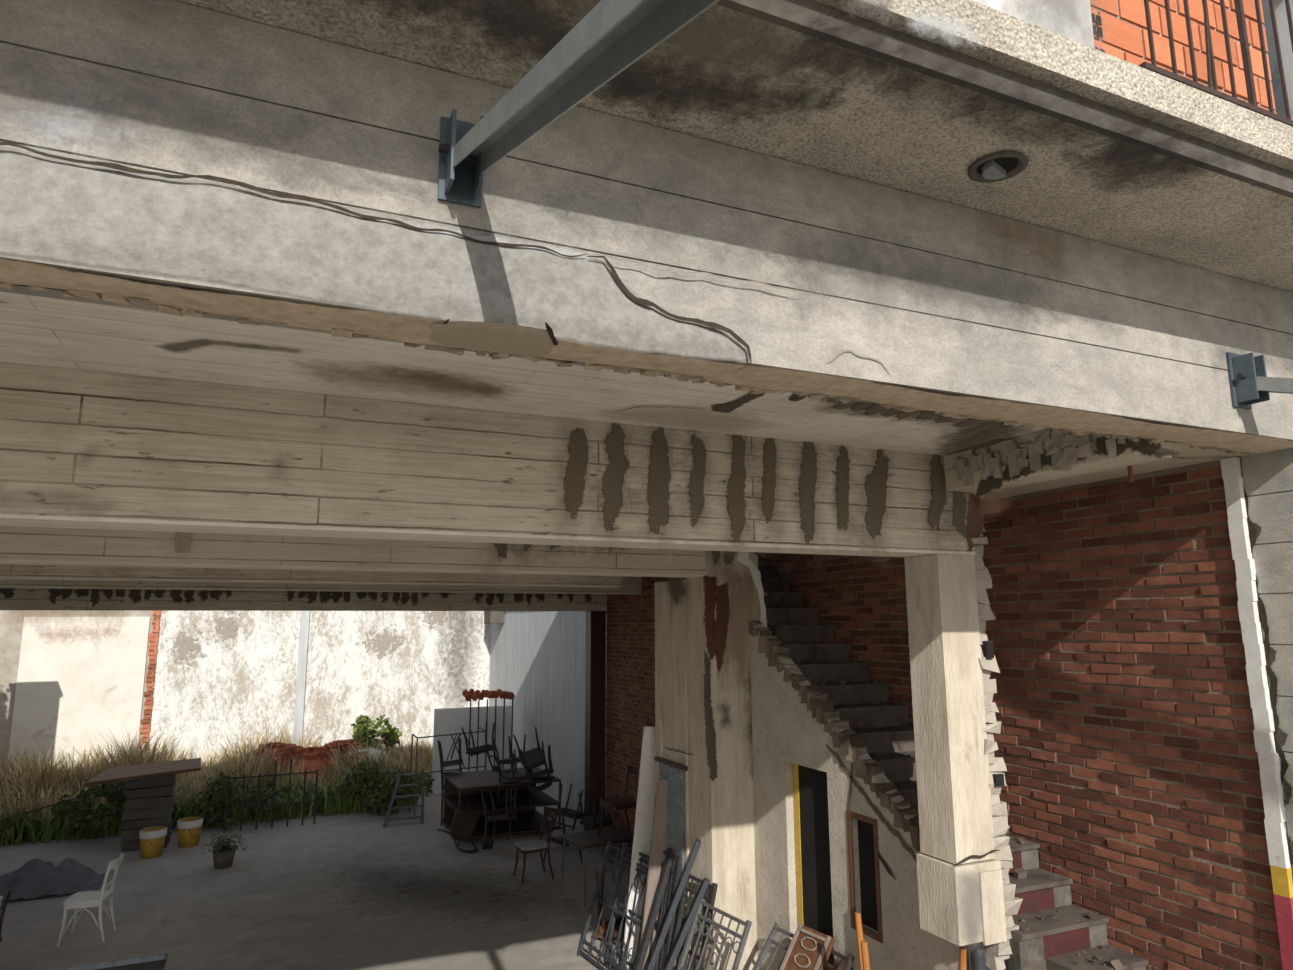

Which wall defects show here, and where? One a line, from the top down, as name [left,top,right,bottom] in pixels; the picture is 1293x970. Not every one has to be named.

crack [0,142,803,413]
peeling [0,258,1293,970]